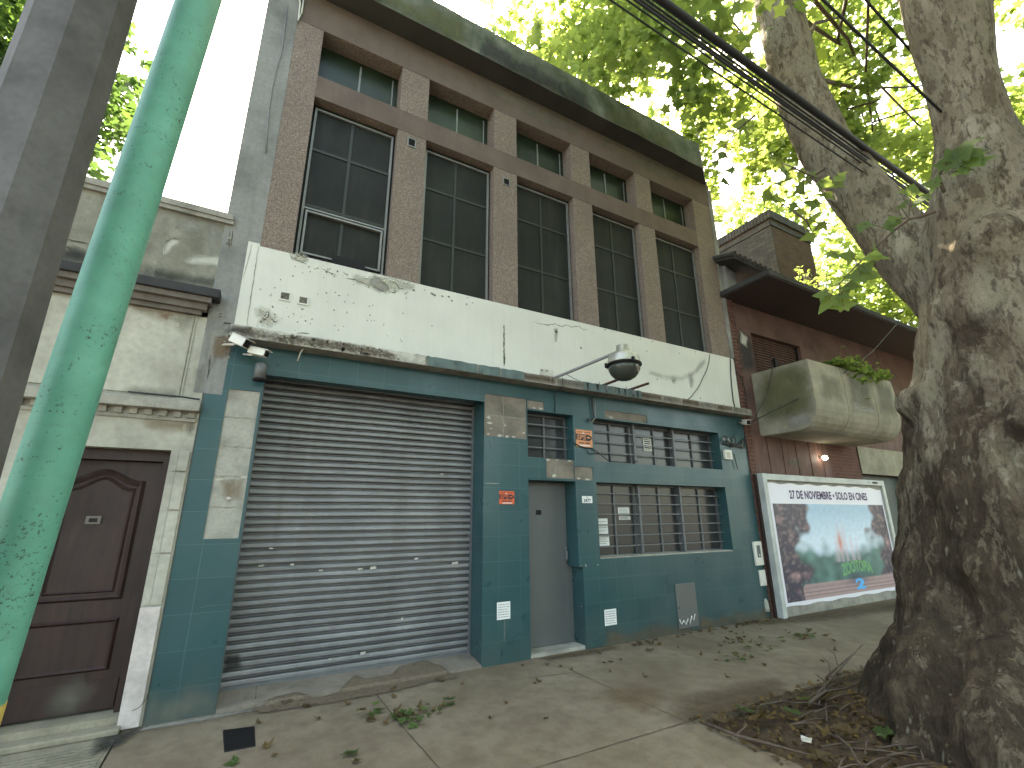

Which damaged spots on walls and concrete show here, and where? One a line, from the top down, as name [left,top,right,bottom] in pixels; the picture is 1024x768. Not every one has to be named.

peeling [216,254,453,361]
leakage [763,370,808,425]